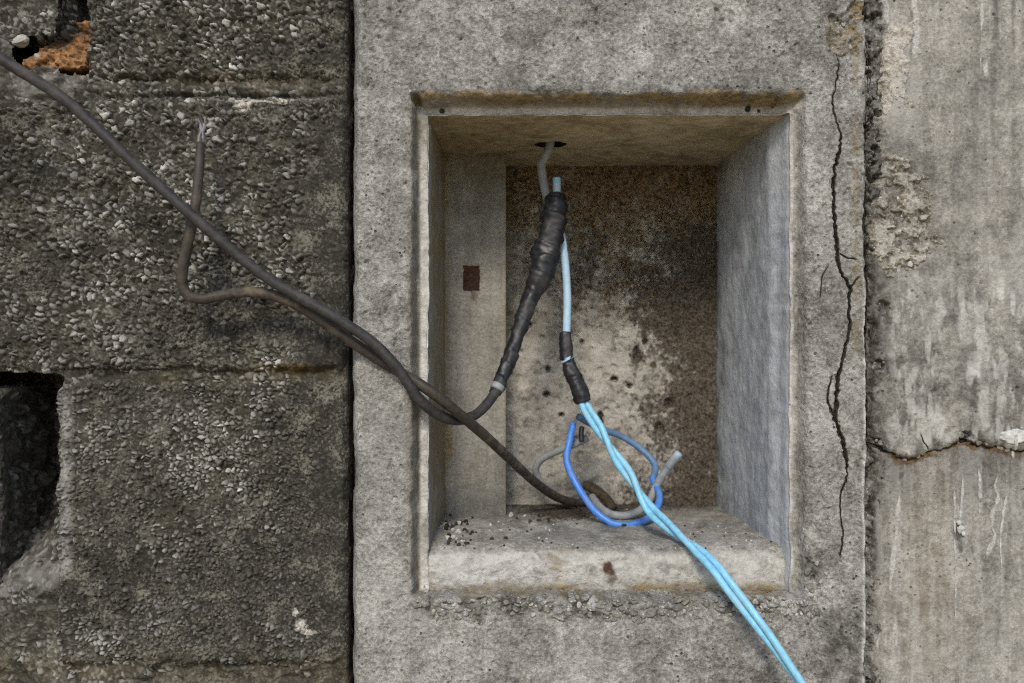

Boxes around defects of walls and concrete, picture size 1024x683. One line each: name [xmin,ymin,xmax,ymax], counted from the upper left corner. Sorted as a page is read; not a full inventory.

water stain [506,165,718,507]
spalling [866,152,945,278]
crack [820,54,1024,557]